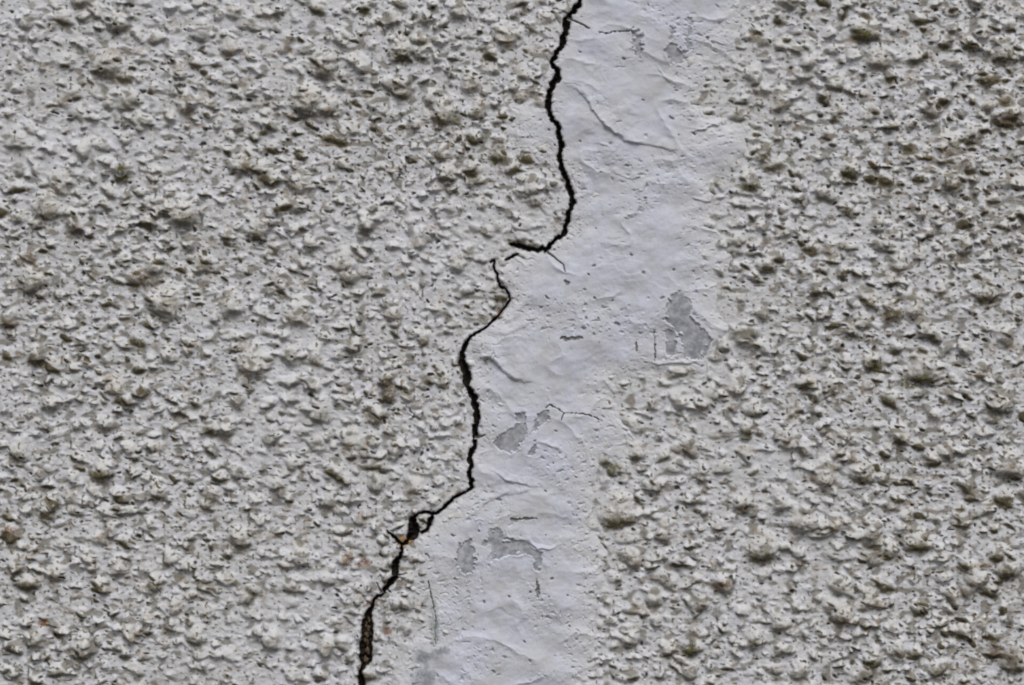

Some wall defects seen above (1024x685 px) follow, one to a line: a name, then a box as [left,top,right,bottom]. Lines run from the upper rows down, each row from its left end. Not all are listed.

crack [358,0,630,685]
spalling [665,291,712,360]
spalling [494,411,550,455]